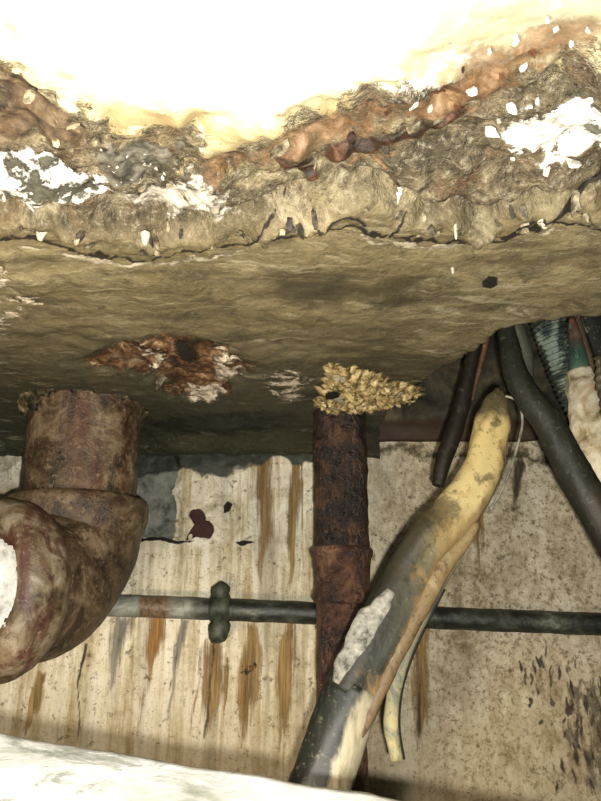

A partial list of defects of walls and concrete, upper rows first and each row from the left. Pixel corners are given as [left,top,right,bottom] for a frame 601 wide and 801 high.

peeling [0,64,114,214]
leakage [96,140,231,220]
spalling [270,103,466,182]
rust [205,16,598,188]
peeling [485,97,601,177]
spalling [84,332,256,403]
rust [146,618,166,677]
leakage [519,648,601,789]